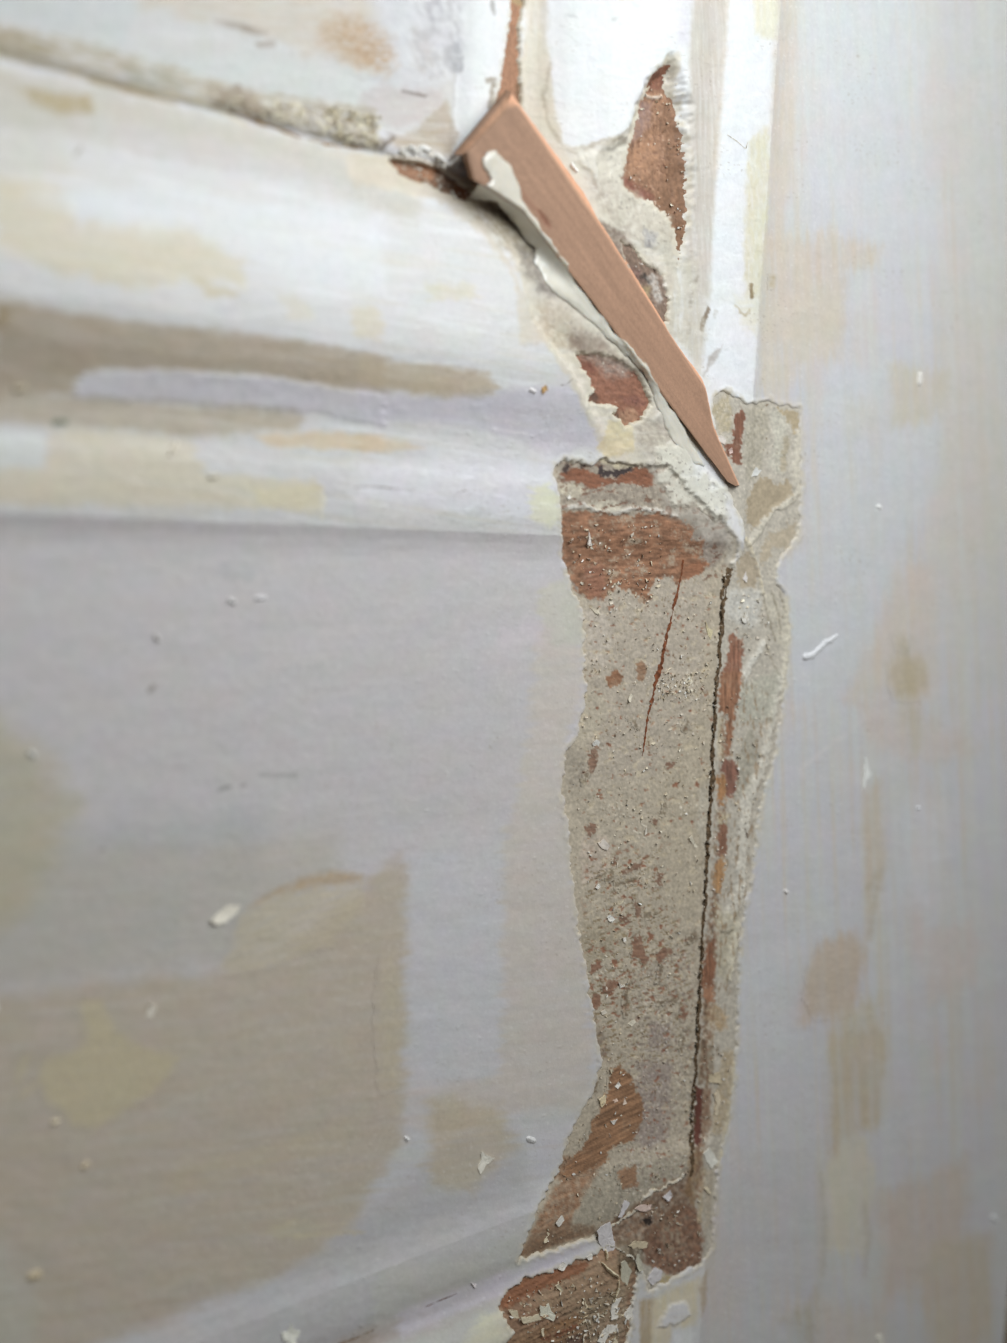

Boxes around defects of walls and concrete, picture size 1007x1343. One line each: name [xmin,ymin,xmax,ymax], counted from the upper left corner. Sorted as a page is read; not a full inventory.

peeling [496,0,522,103]
peeling [625,65,687,260]
peeling [622,243,668,322]
peeling [576,353,649,425]
crack [642,560,684,756]
peeling [498,392,801,1343]
crack [688,567,733,1177]
peeling [478,1151,495,1174]